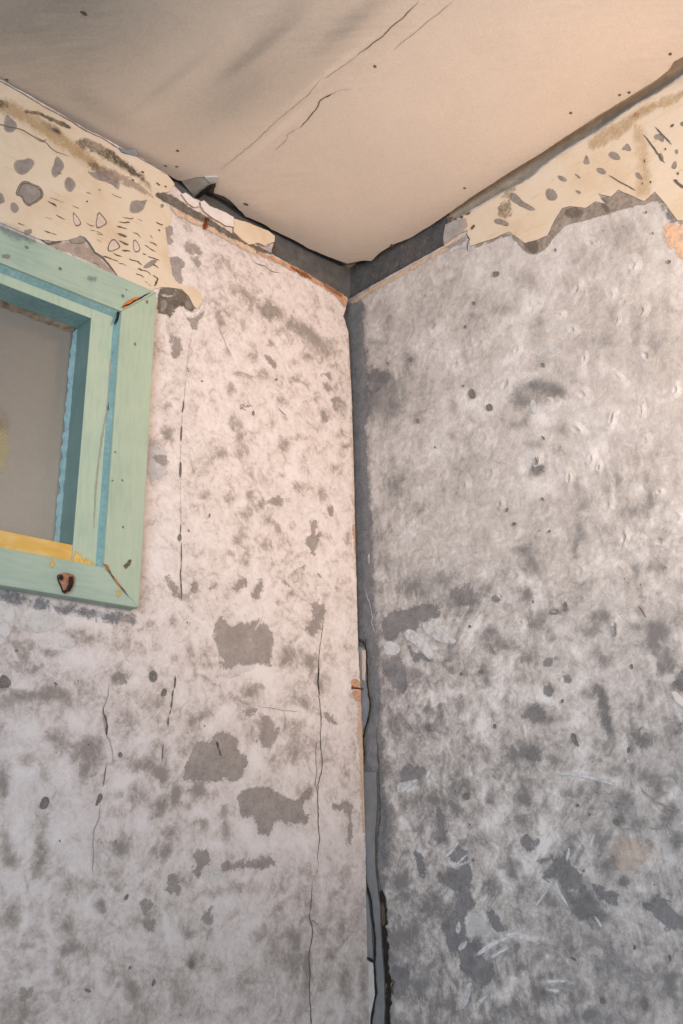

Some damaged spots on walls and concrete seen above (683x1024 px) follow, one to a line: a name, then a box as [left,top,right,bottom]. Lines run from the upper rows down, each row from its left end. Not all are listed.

damp [25,110,71,135]
damp [77,139,148,184]
crack [224,0,455,167]
peeling [0,77,683,895]
crack [92,686,113,872]
crack [261,618,324,1024]